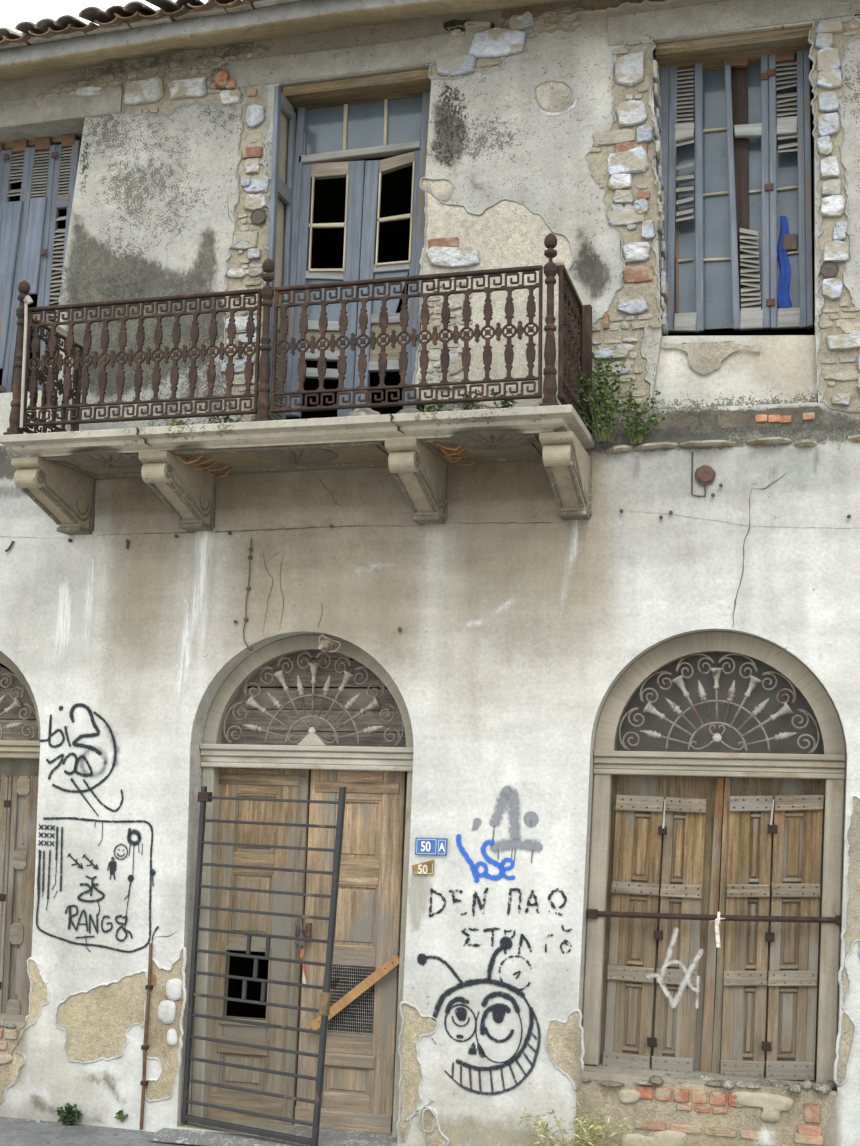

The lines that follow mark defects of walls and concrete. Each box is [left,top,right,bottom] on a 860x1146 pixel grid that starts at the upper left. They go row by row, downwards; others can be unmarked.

water stain [434,106,465,164]
spalling [412,177,575,408]
spalling [585,143,626,325]
spalling [609,13,860,429]
crack [597,473,846,627]
spalling [0,947,187,1105]
flaking render [544,795,860,1146]